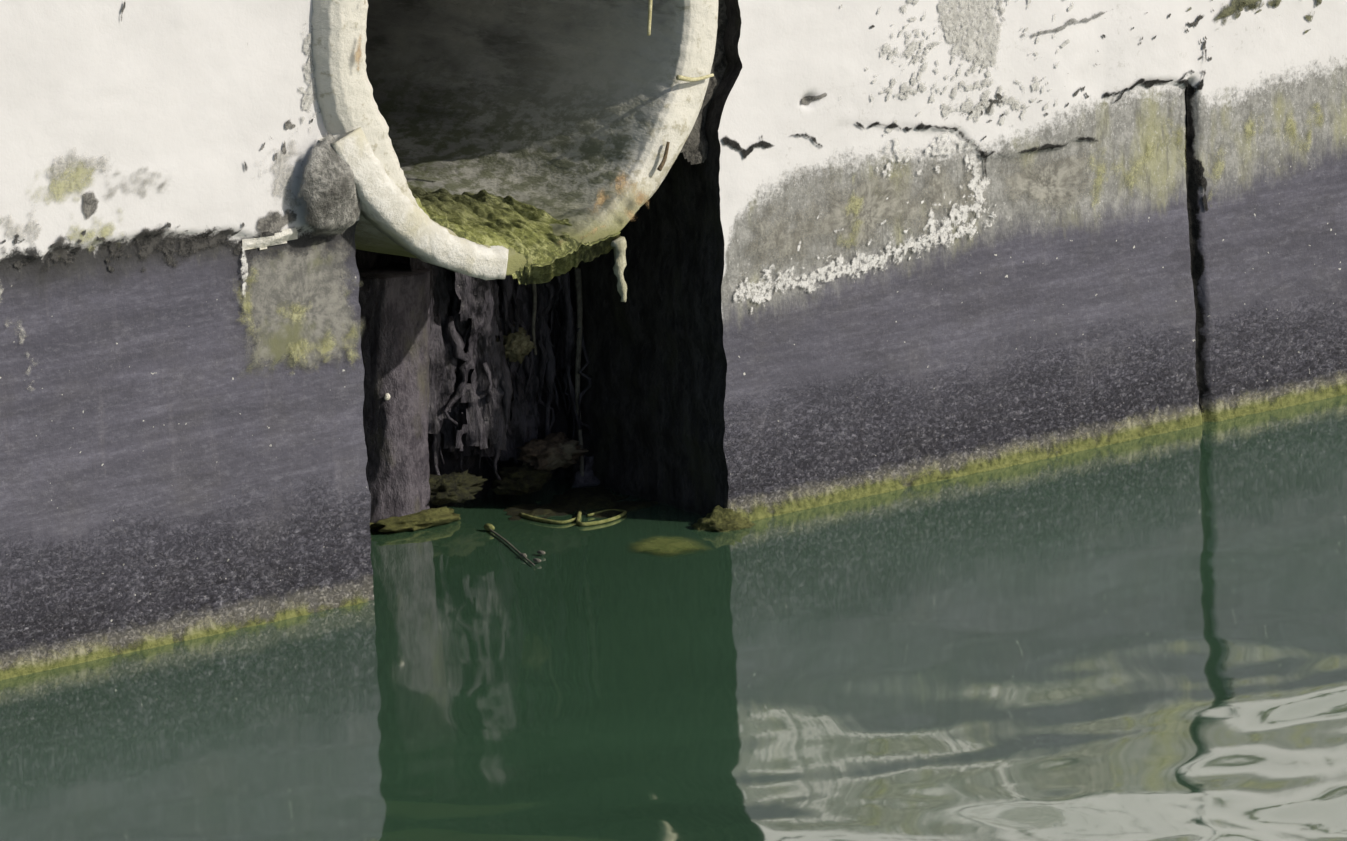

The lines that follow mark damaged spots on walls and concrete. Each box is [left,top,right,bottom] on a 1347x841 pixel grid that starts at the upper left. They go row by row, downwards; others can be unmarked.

peeling [865,0,1089,148]
spalling [257,209,297,237]
water stain [734,130,997,312]
crack [856,122,1097,177]
water stain [1005,153,1091,206]
crack [1103,50,1209,414]